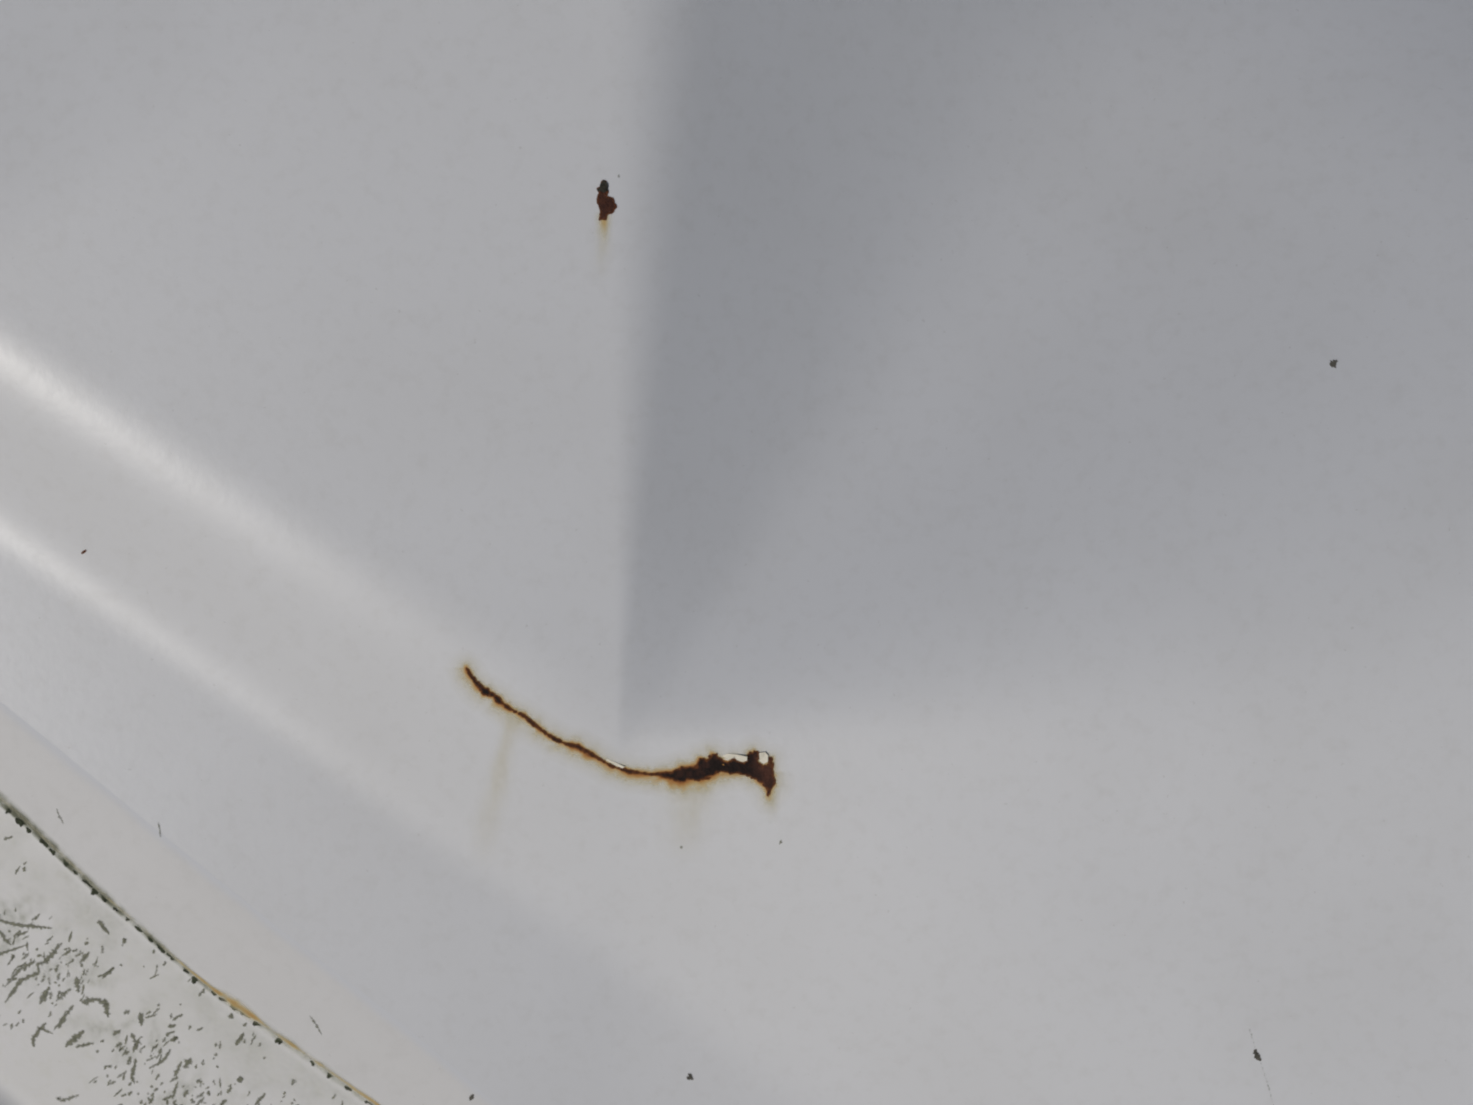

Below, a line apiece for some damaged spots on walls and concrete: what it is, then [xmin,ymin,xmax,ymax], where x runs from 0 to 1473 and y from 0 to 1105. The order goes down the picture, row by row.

rust [596,180,617,231]